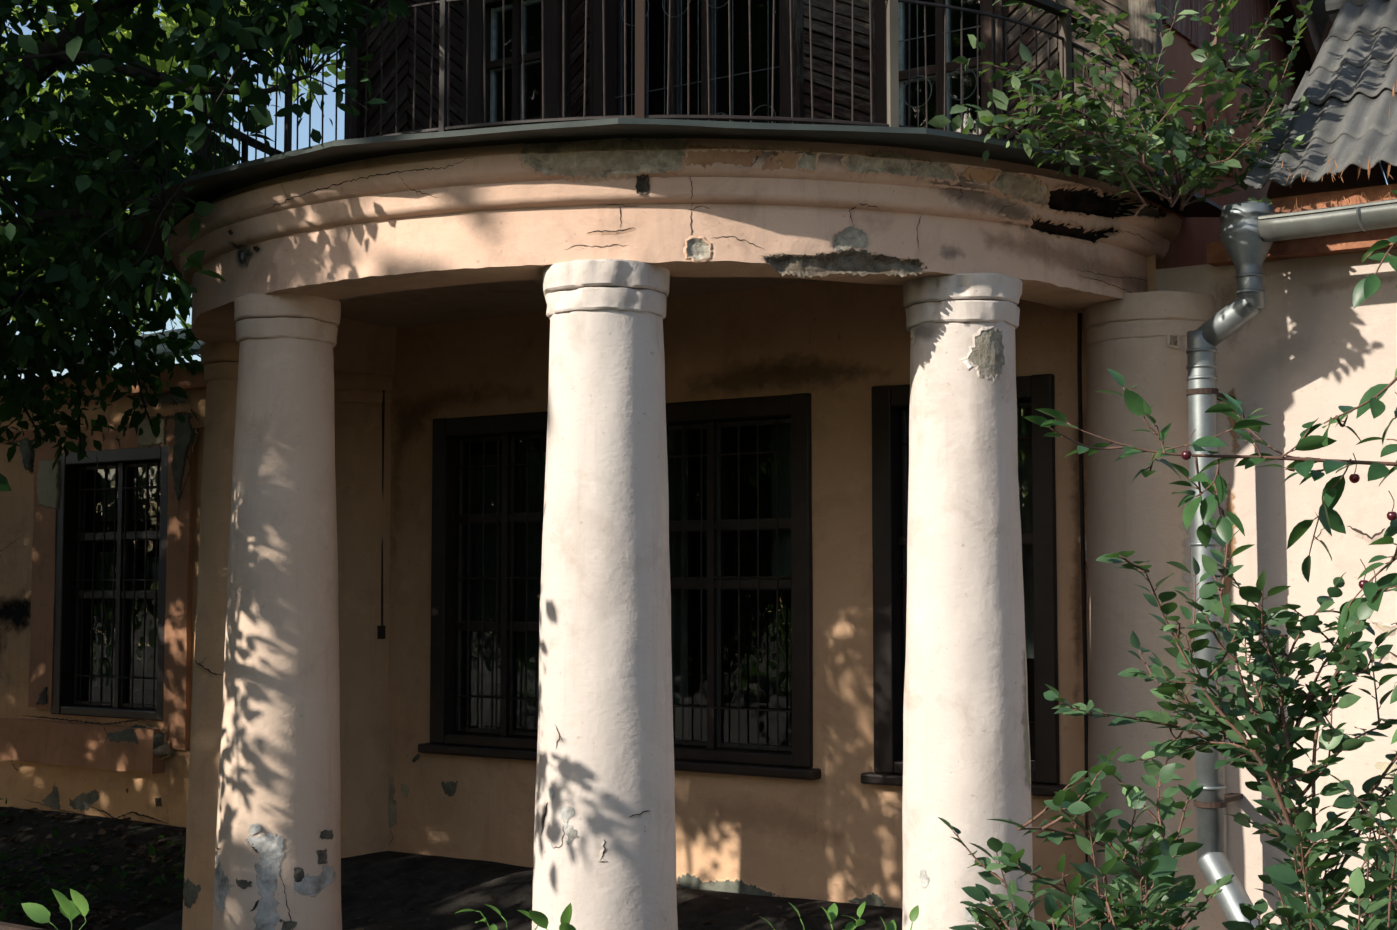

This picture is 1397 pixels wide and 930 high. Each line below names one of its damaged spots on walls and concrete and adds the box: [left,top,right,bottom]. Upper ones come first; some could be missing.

crack [567,204,638,250]
spalling [517,138,927,278]
spalling [840,148,1175,246]
peeling [959,324,1006,382]
spalling [42,782,99,811]
peeling [540,787,579,848]
peeling [183,823,336,930]